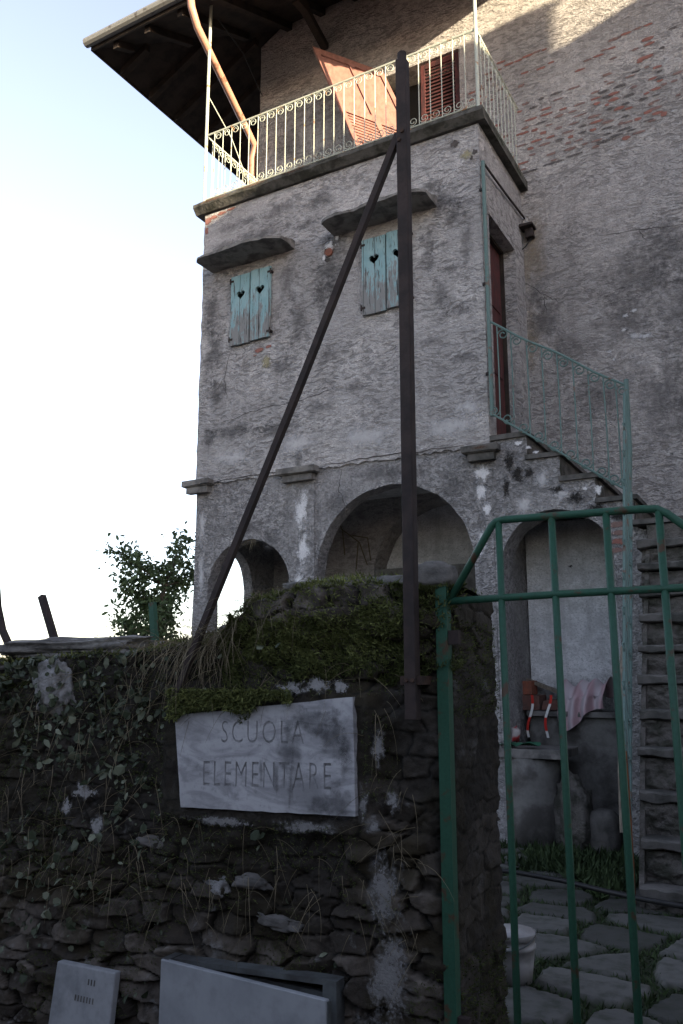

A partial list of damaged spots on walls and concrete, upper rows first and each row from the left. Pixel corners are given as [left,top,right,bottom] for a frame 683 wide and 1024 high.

spalling [322,236,339,262]
crack [323,445,464,508]
peeling [475,464,491,516]
leakage [503,453,533,498]
peeling [294,489,310,582]